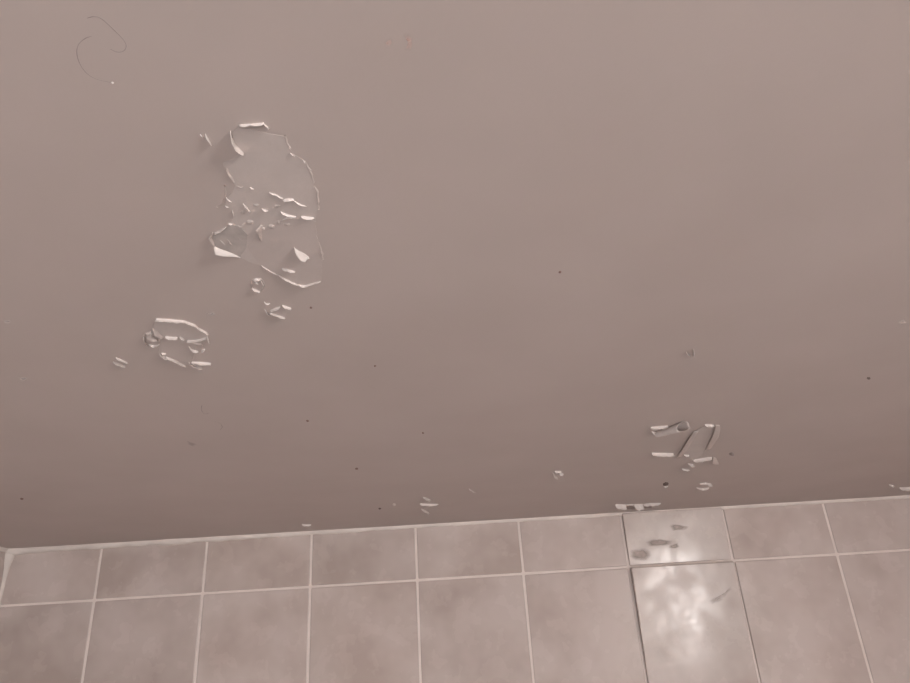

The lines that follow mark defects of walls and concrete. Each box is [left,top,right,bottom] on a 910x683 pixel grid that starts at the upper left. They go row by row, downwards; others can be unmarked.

peeling [208,123,324,288]
peeling [264,302,291,319]
peeling [142,318,211,370]
peeling [651,421,720,471]